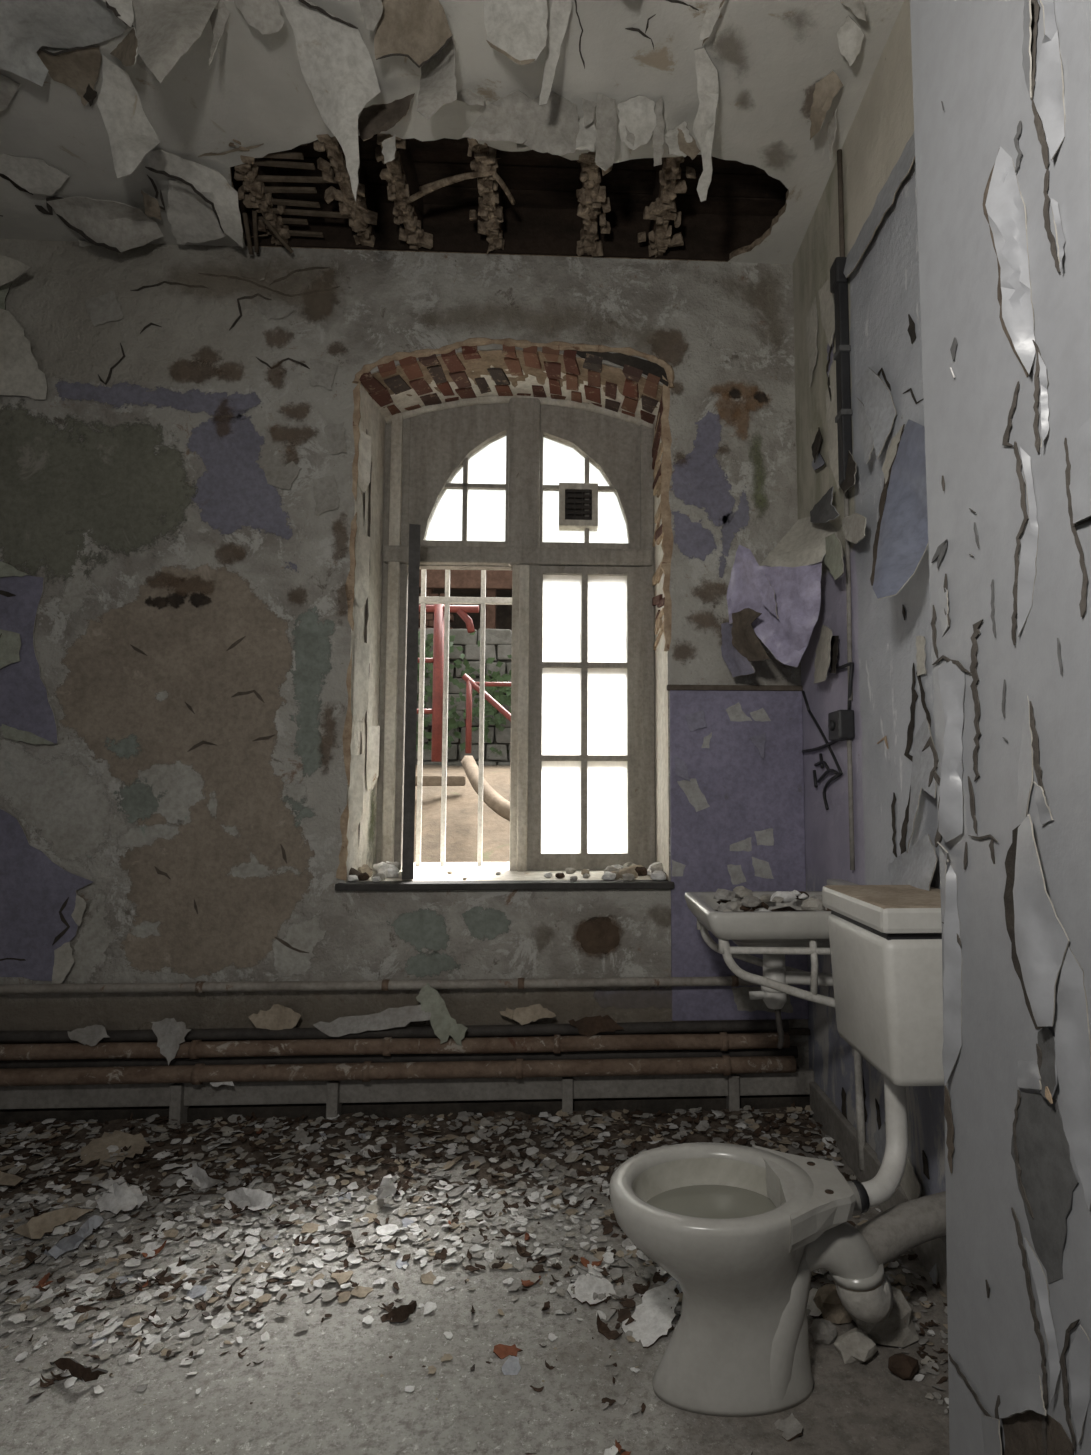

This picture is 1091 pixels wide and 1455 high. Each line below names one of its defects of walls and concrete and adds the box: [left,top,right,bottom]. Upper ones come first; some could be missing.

peeling [0,0,725,253]
crack [98,267,340,385]
peeling [721,132,948,684]
crack [1032,340,1049,452]
damp [145,571,214,609]
damp [215,543,248,564]
damp [333,514,348,559]
peeling [1064,417,1091,617]
flaking render [0,560,315,984]
damp [319,708,337,771]
peeling [877,619,983,1173]
peeling [981,696,1091,1455]